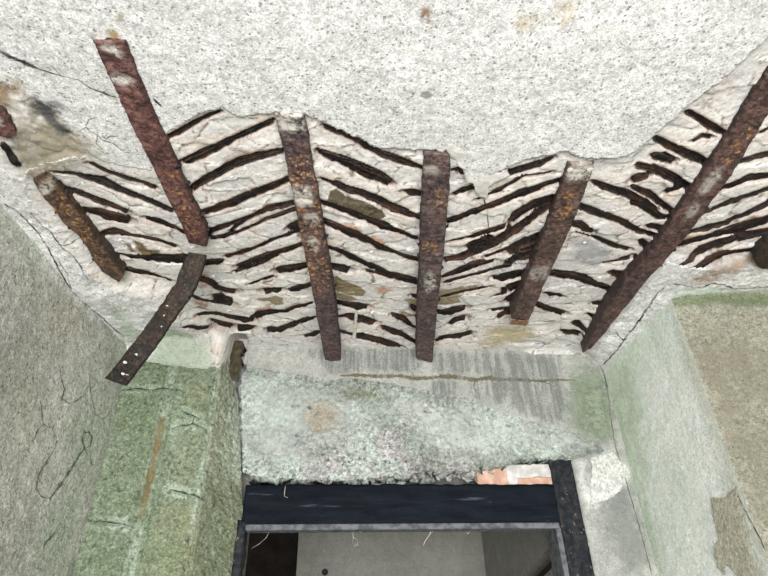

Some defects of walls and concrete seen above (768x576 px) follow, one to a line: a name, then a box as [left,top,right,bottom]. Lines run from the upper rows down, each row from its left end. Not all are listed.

leakage [17,98,86,175]
crack [0,50,116,98]
spalling [434,37,768,363]
spalling [0,82,627,505]
crack [34,371,112,499]
crack [603,283,765,460]
crack [625,478,652,574]
flaking render [710,487,760,576]